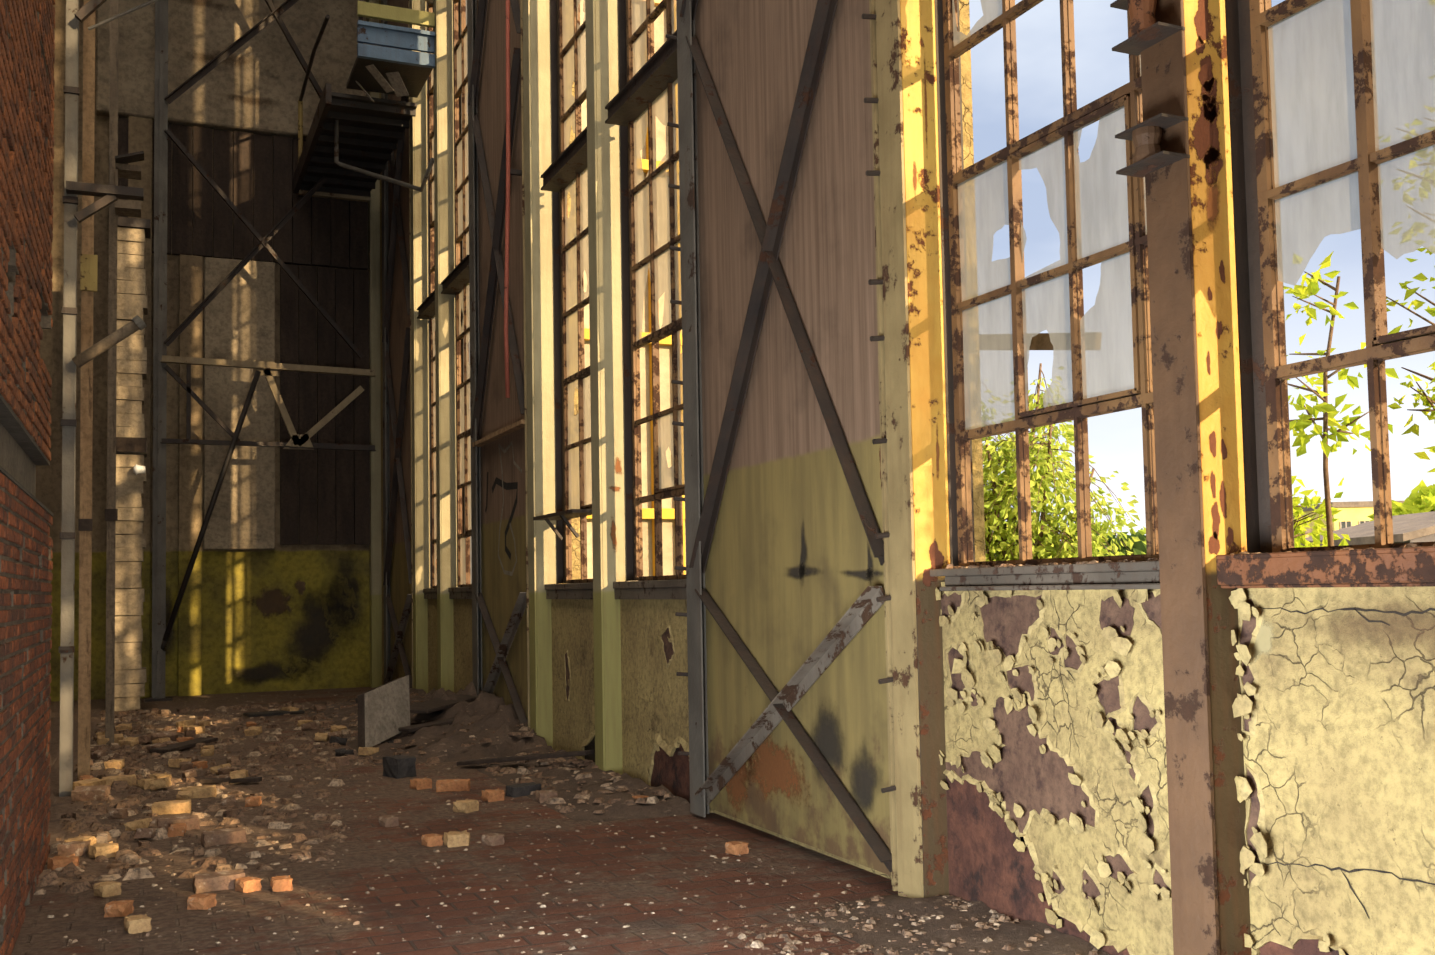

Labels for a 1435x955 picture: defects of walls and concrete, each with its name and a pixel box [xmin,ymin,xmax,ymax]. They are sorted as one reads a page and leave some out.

rust [1192,0,1223,227]
water stain [233,560,362,683]
flaking render [935,583,1171,955]
flaking render [1244,932,1359,955]
crack [1264,862,1435,918]